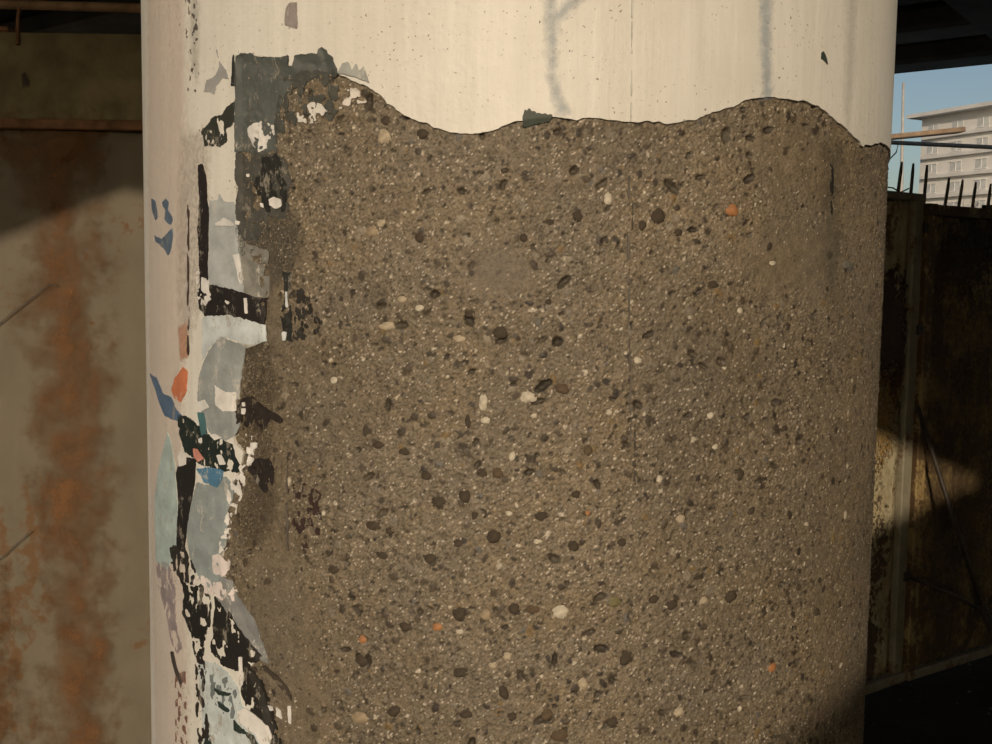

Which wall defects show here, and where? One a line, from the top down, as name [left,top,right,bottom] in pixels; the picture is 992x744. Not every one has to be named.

spalling [156,0,893,744]
rust [875,264,908,472]